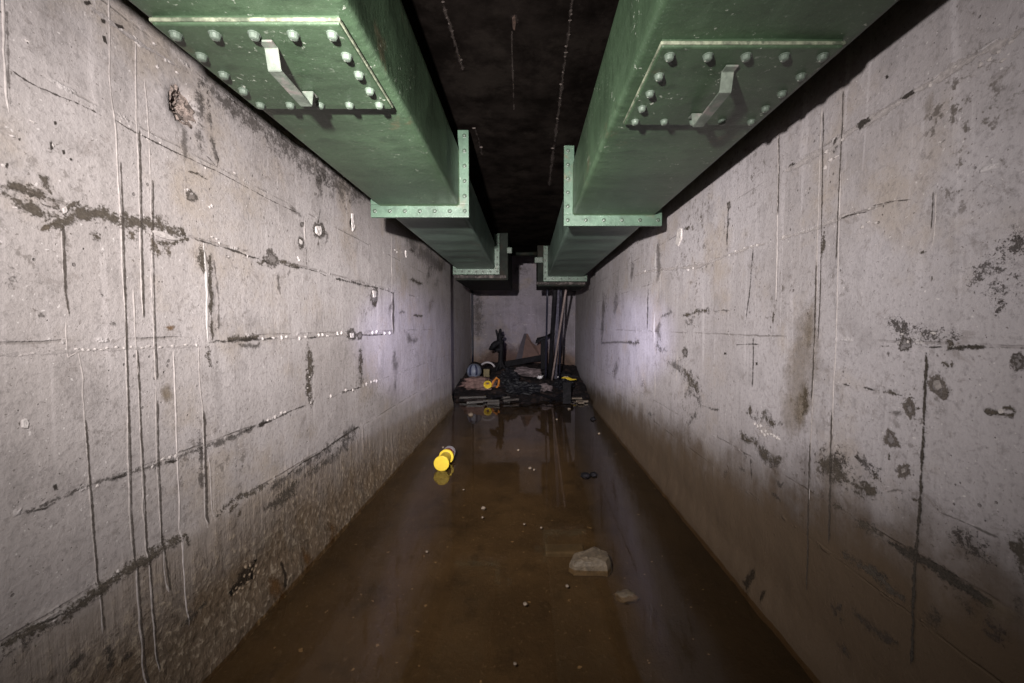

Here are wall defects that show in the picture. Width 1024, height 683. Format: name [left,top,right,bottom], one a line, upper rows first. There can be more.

spalling [156,59,219,167]
crack [780,199,908,240]
mould [961,224,1024,315]
leakage [0,0,367,683]
leakage [806,93,881,589]